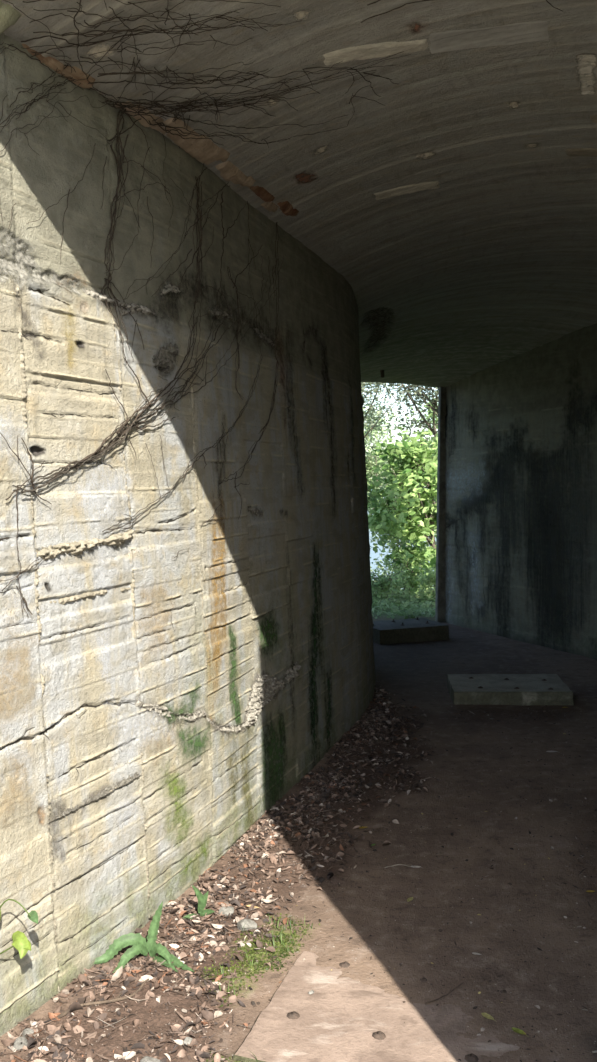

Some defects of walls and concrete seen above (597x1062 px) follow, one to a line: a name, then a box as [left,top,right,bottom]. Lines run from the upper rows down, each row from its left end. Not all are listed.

spalling [576,54,597,95]
leakage [445,371,597,646]
rust [211,510,226,666]
crack [0,699,135,750]